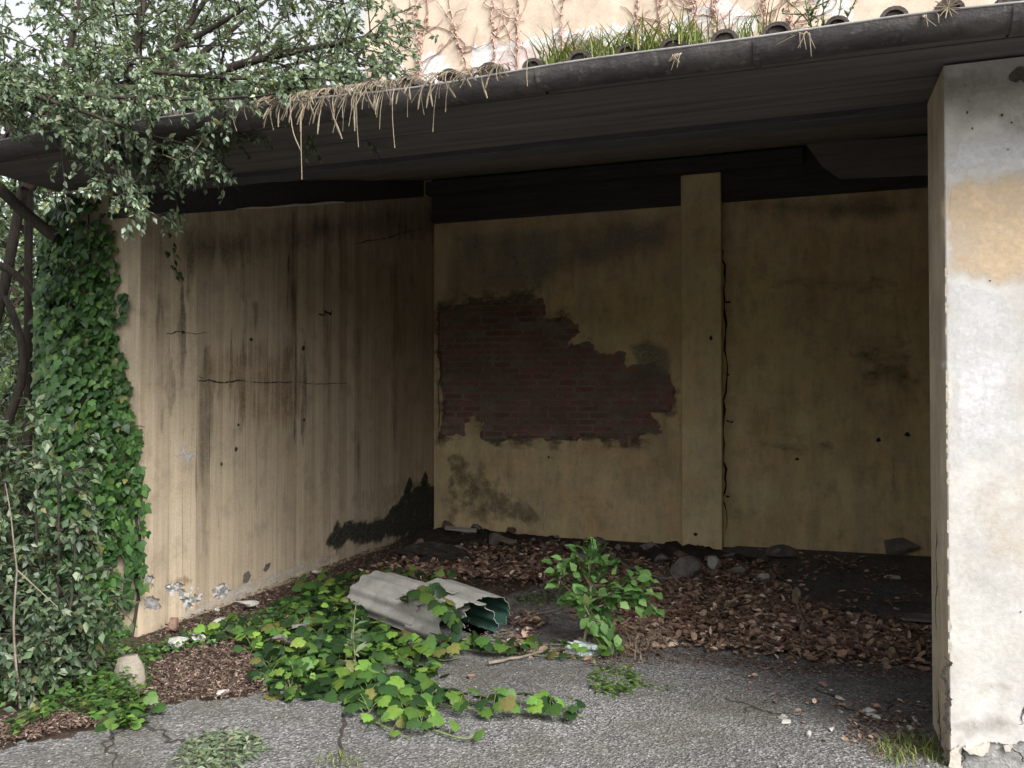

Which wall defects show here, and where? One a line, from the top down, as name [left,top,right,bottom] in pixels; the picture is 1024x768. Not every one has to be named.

crack [197,376,343,384]
flaking render [435,290,677,447]
crack [722,248,733,530]
water stain [322,471,434,562]
spalling [144,576,230,611]